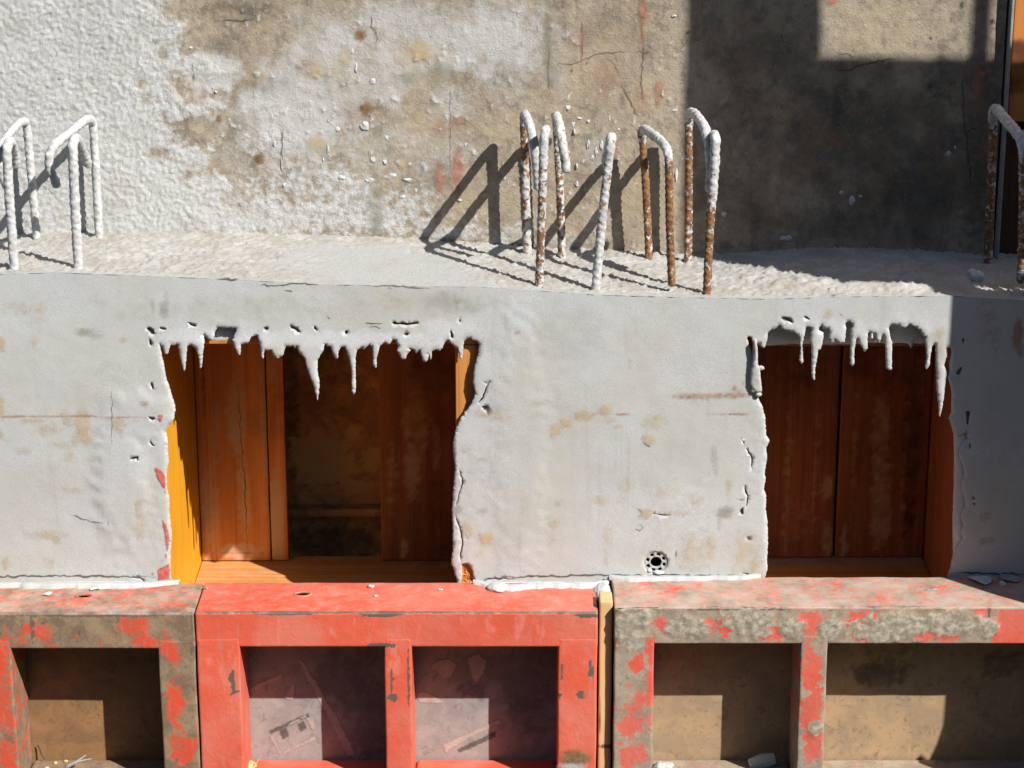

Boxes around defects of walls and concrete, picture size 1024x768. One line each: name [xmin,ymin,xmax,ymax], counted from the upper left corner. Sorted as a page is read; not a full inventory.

crack [548,17,651,116]
peeling [214,327,236,341]
peeling [747,316,925,397]
peeling [155,468,166,492]
peeling [152,521,170,581]
spalling [461,563,474,583]